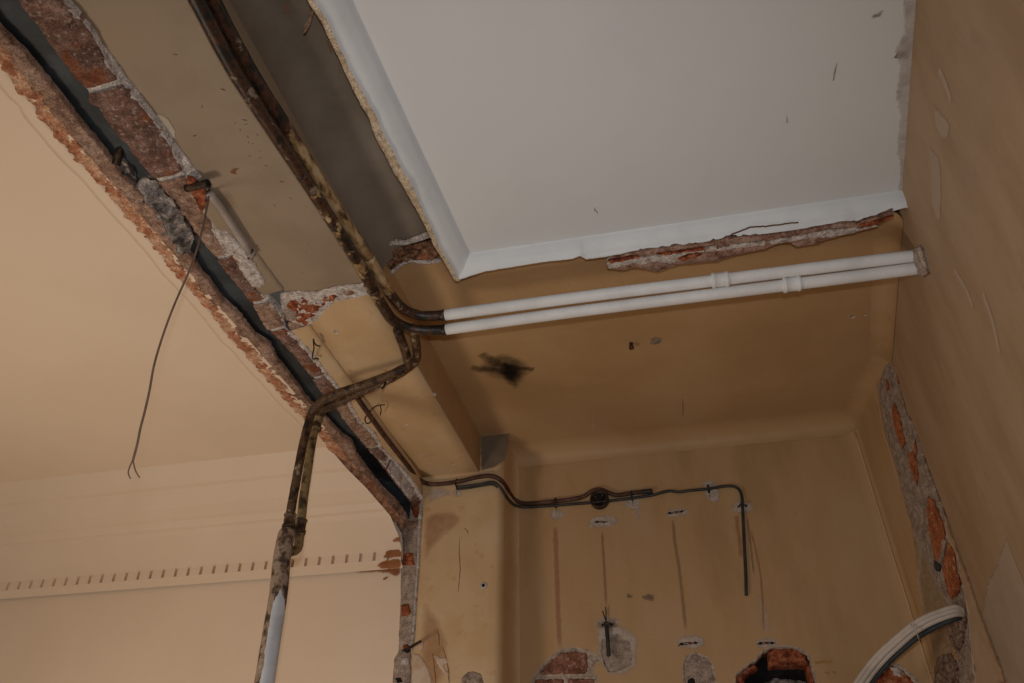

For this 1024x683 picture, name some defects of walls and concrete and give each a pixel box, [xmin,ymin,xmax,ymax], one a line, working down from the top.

spalling [308,0,460,281]
spalling [0,45,307,420]
spalling [606,208,894,272]
spalling [287,295,338,326]
spalling [318,427,405,528]
flaking render [886,376,919,486]
flaking render [926,496,958,599]
flaking render [532,624,636,683]
spalling [734,645,817,683]
flaking render [875,663,919,683]